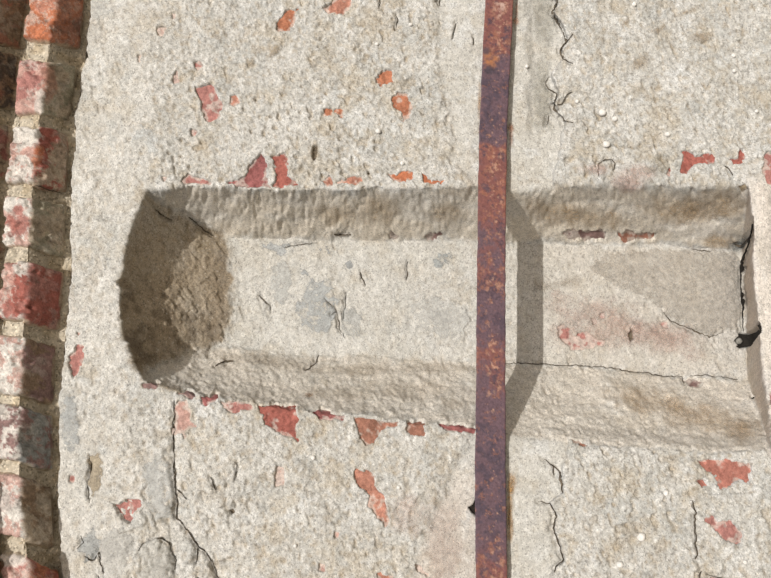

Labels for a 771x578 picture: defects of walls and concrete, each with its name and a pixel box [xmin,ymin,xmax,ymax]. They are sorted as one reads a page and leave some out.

crack [551,0,573,64]
crack [545,78,573,126]
spalling [228,154,298,188]
spalling [666,151,715,176]
crack [734,224,754,331]
crack [663,312,723,338]
crack [506,362,738,383]
spalling [172,391,299,442]
spalling [312,409,425,446]
crack [172,403,218,578]
spalling [354,469,389,527]
spalling [697,459,752,489]